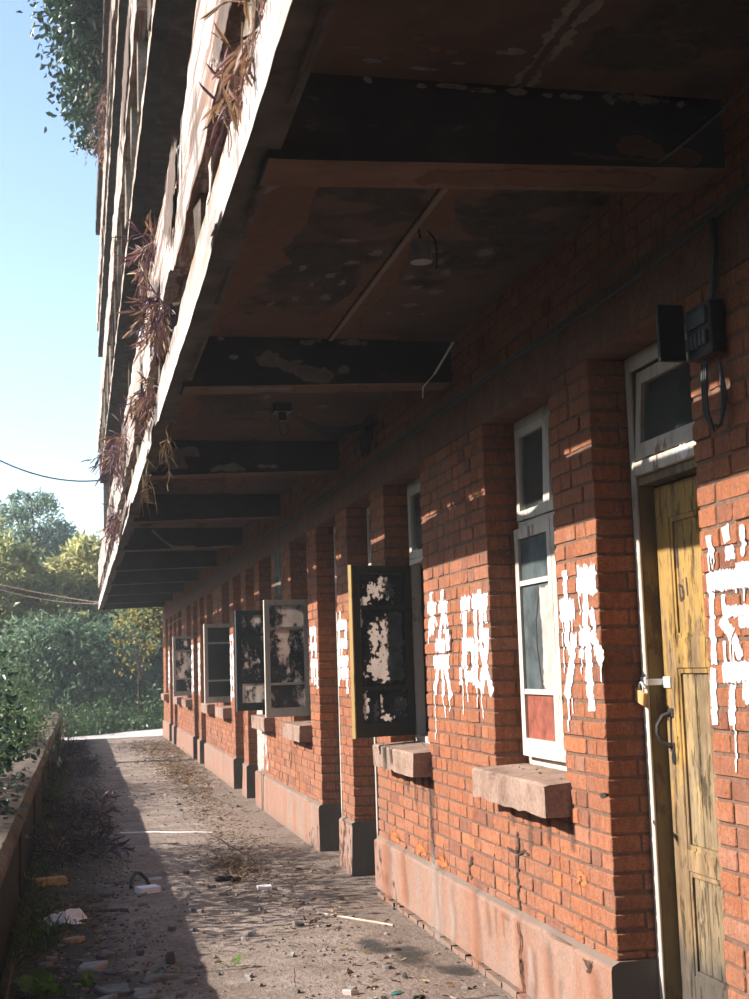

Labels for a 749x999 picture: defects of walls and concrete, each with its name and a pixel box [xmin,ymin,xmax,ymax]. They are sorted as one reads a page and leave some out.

spalling [205,349,367,392]